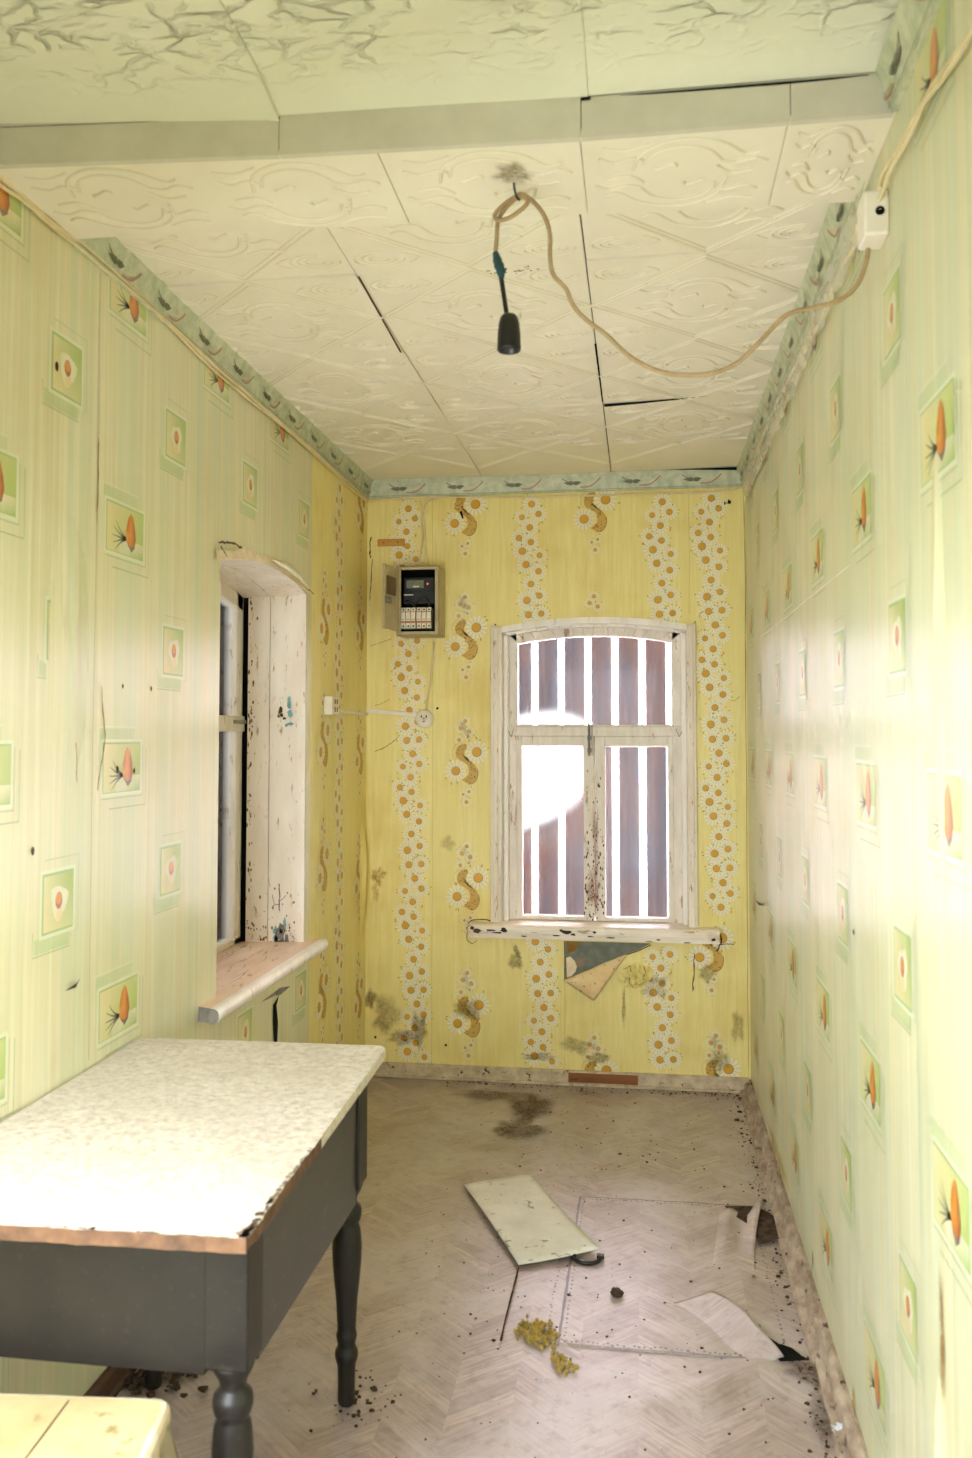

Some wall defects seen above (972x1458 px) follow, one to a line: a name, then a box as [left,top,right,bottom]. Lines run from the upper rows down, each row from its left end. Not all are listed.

flaking render [553,770,660,979]